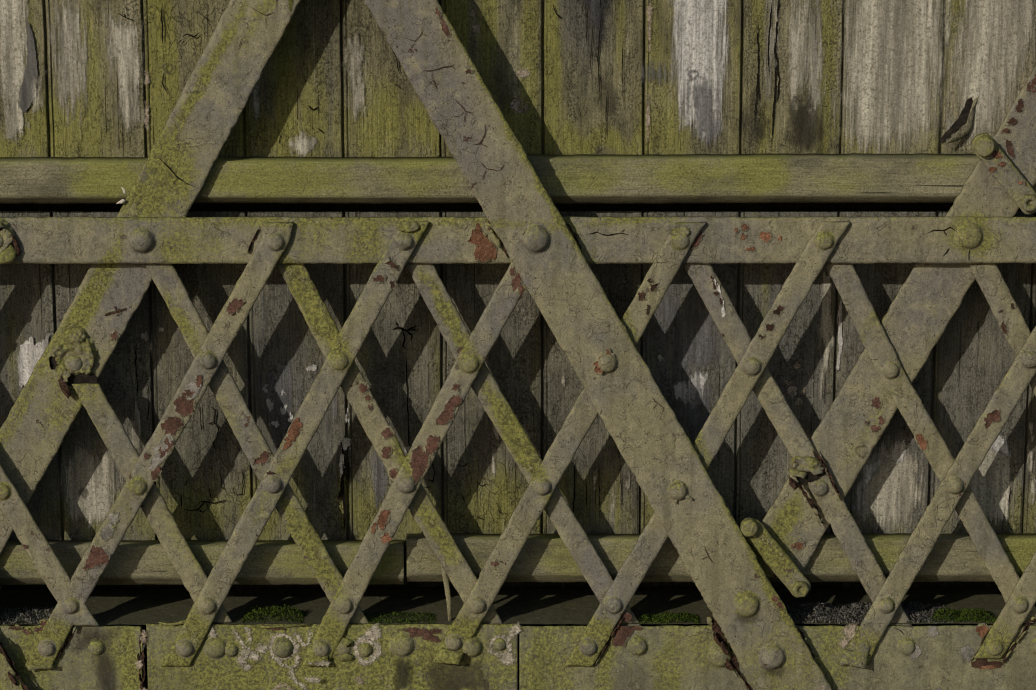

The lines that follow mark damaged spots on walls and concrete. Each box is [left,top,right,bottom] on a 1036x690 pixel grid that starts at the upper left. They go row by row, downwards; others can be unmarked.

crack [754,0,780,145]
corrosion [988,74,1036,172]
corrosion [466,220,527,295]
corrosion [143,373,204,481]
corrosion [380,382,462,485]
corrosion [82,543,111,571]